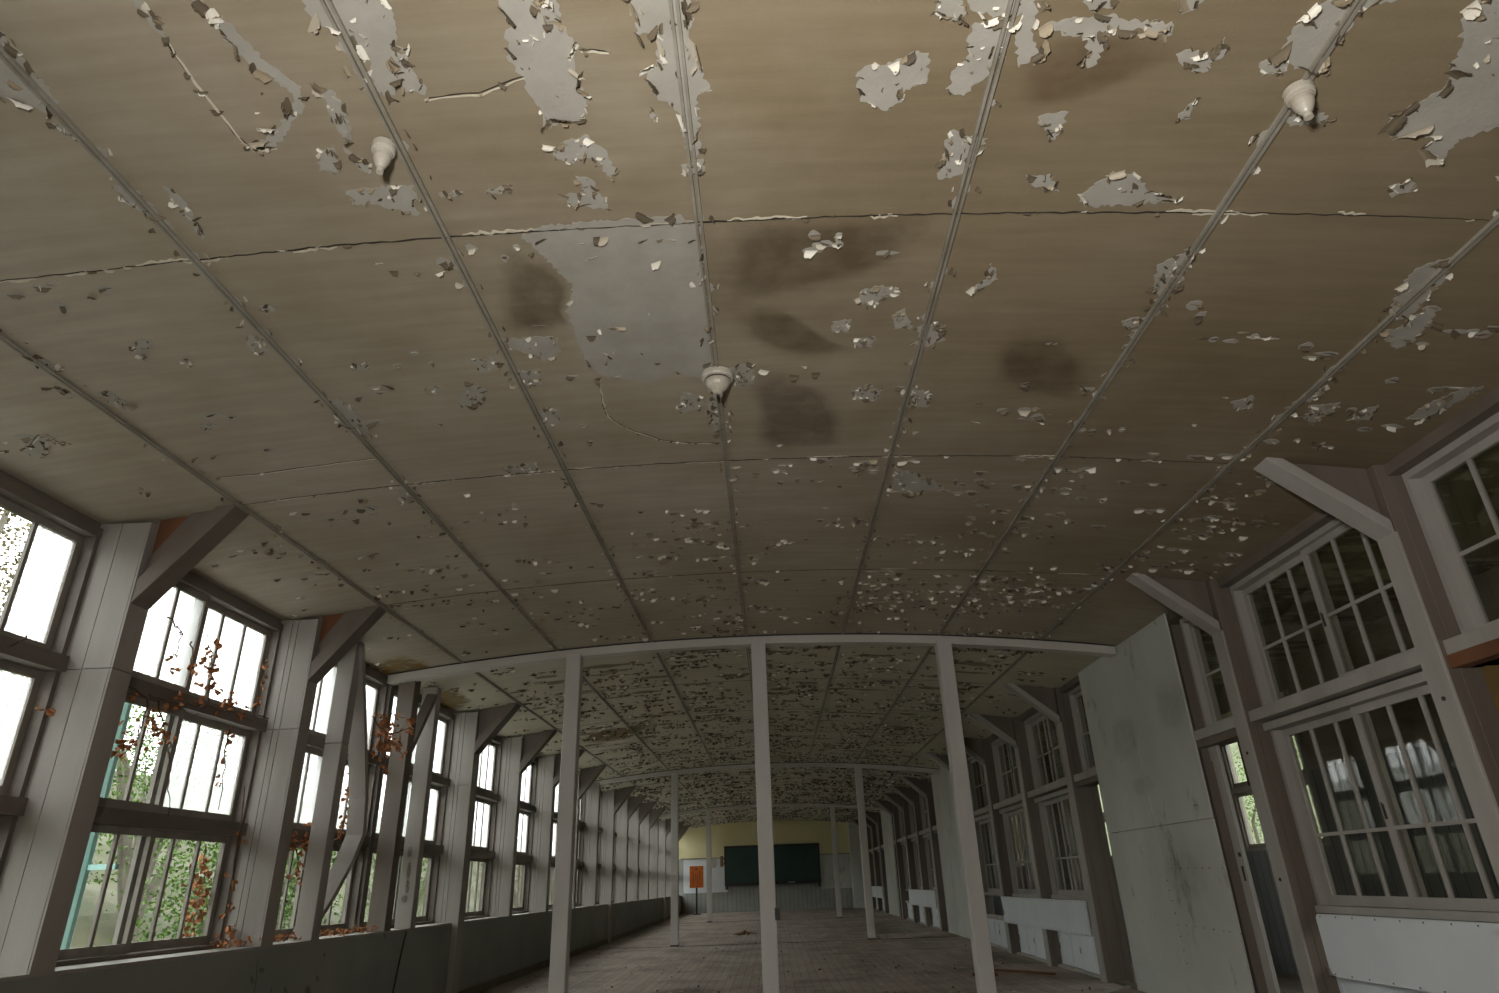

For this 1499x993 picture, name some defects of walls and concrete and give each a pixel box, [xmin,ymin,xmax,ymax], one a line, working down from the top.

peeling [0,30,77,142]
peeling [134,0,166,38]
peeling [191,0,463,216]
peeling [855,50,931,111]
peeling [1259,0,1397,77]
peeling [1378,0,1499,198]
peeling [109,177,275,355]
peeling [376,244,483,290]
peeling [424,0,770,443]
peeling [802,230,844,259]
crack [215,377,1227,505]